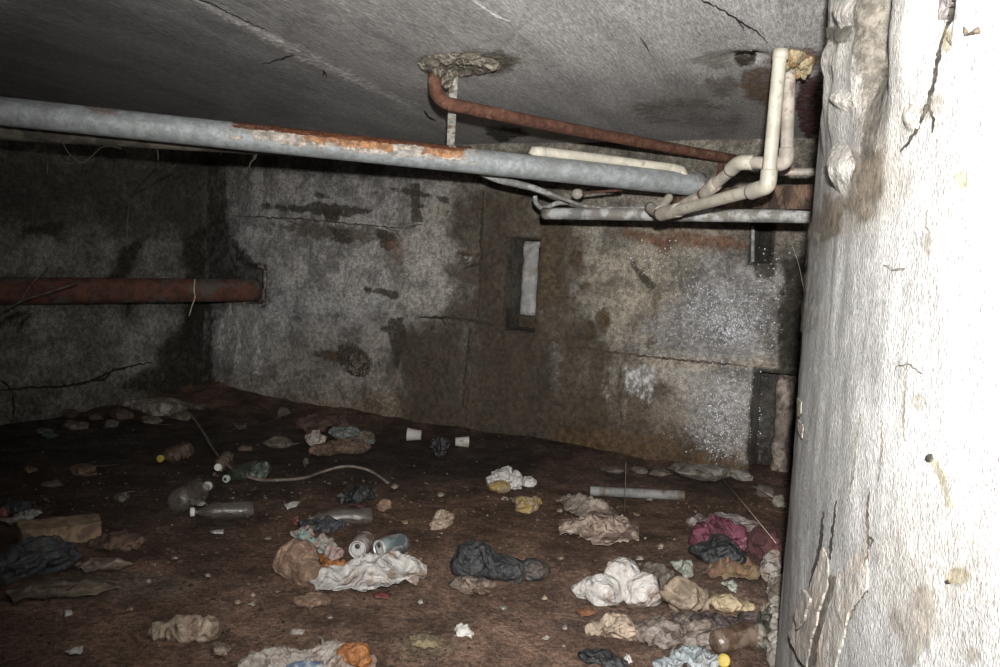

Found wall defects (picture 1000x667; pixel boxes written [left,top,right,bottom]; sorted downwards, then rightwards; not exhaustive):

crack [900,0,955,151]
corrosion [231,122,468,158]
water stain [261,192,397,250]
water stain [183,302,266,382]
crack [0,362,152,417]
peeling [788,545,869,667]